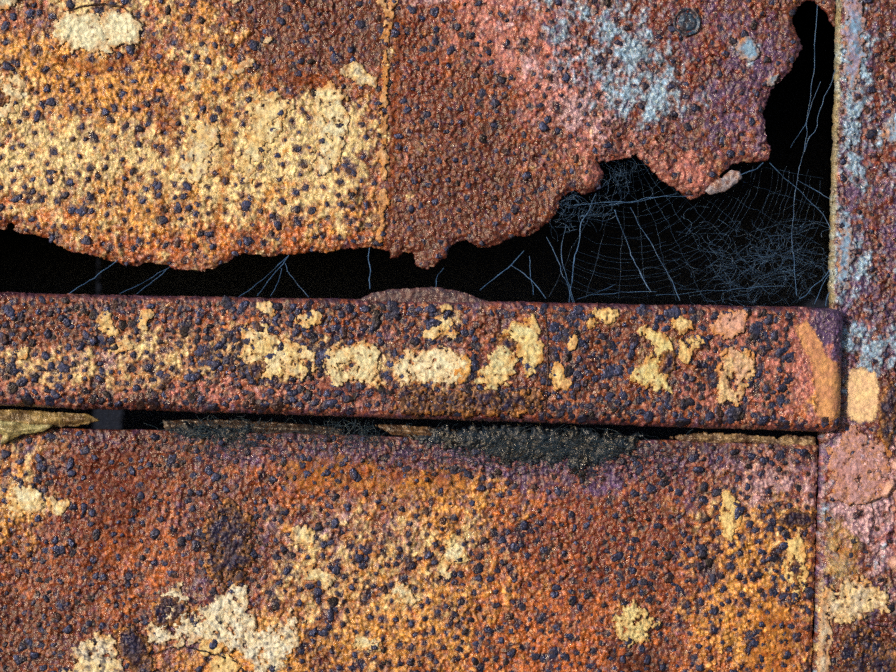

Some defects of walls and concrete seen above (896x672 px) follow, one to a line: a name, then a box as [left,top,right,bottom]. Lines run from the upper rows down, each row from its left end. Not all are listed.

peeling [0,74,27,122]
peeling [52,9,144,55]
corrosion [0,0,291,266]
peeling [178,121,220,184]
peeling [237,91,295,184]
corrosion [276,138,377,252]
peeling [308,61,378,175]
corrosion [317,0,606,246]
corrosion [705,129,745,195]
peeling [735,36,760,61]
corrosion [0,287,850,433]
corrosion [0,430,815,672]